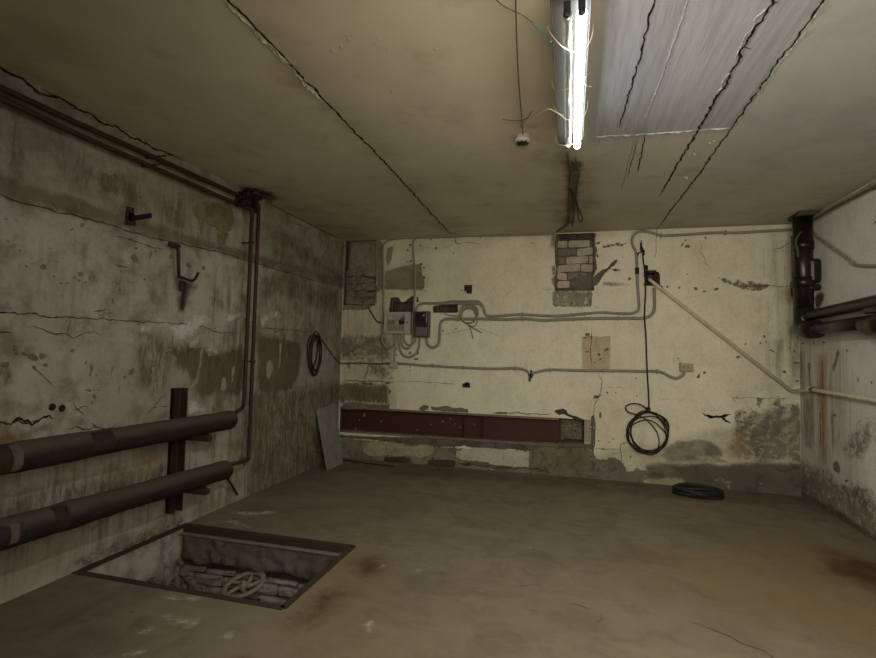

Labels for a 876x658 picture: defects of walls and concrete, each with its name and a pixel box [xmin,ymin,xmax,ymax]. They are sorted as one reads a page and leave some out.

crack [0,67,181,159]
crack [227,0,476,245]
crack [0,194,336,339]
peeling [552,233,626,307]
water stain [139,315,244,415]
crack [0,403,114,430]
water stain [250,337,390,495]
peeling [340,439,533,473]
water stain [647,430,876,541]